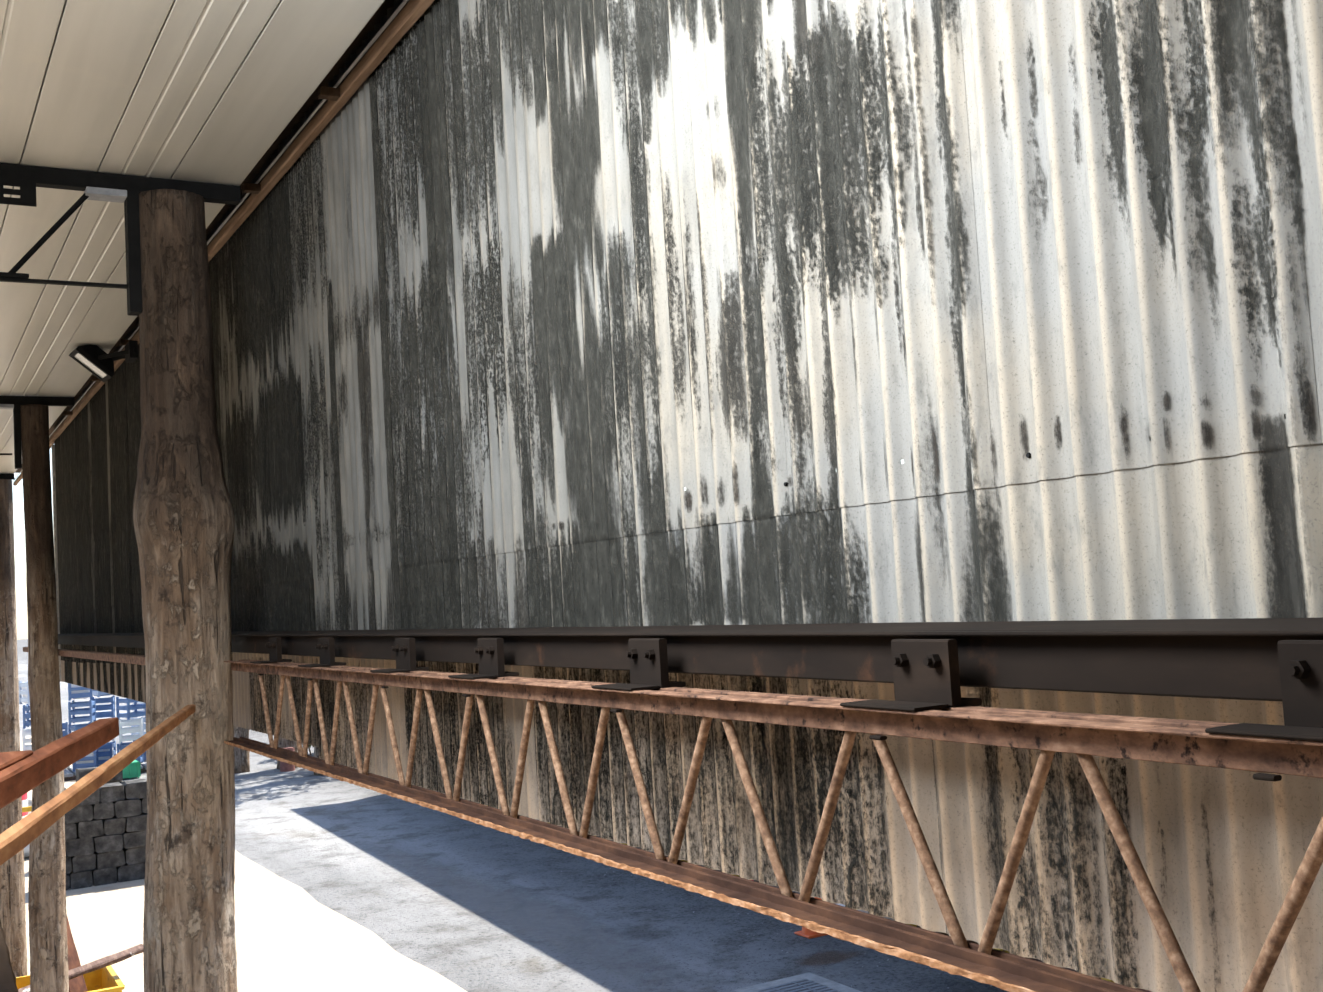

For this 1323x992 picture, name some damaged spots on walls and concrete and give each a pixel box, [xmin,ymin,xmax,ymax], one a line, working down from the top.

leakage [1027,40,1049,235]
leakage [209,0,1011,632]
leakage [1069,0,1316,618]
leakage [54,343,146,702]
leakage [416,661,478,674]
leakage [404,688,515,809]
leakage [534,666,631,684]
leakage [534,700,895,921]
leakage [669,673,864,699]
leakage [982,745,1138,987]